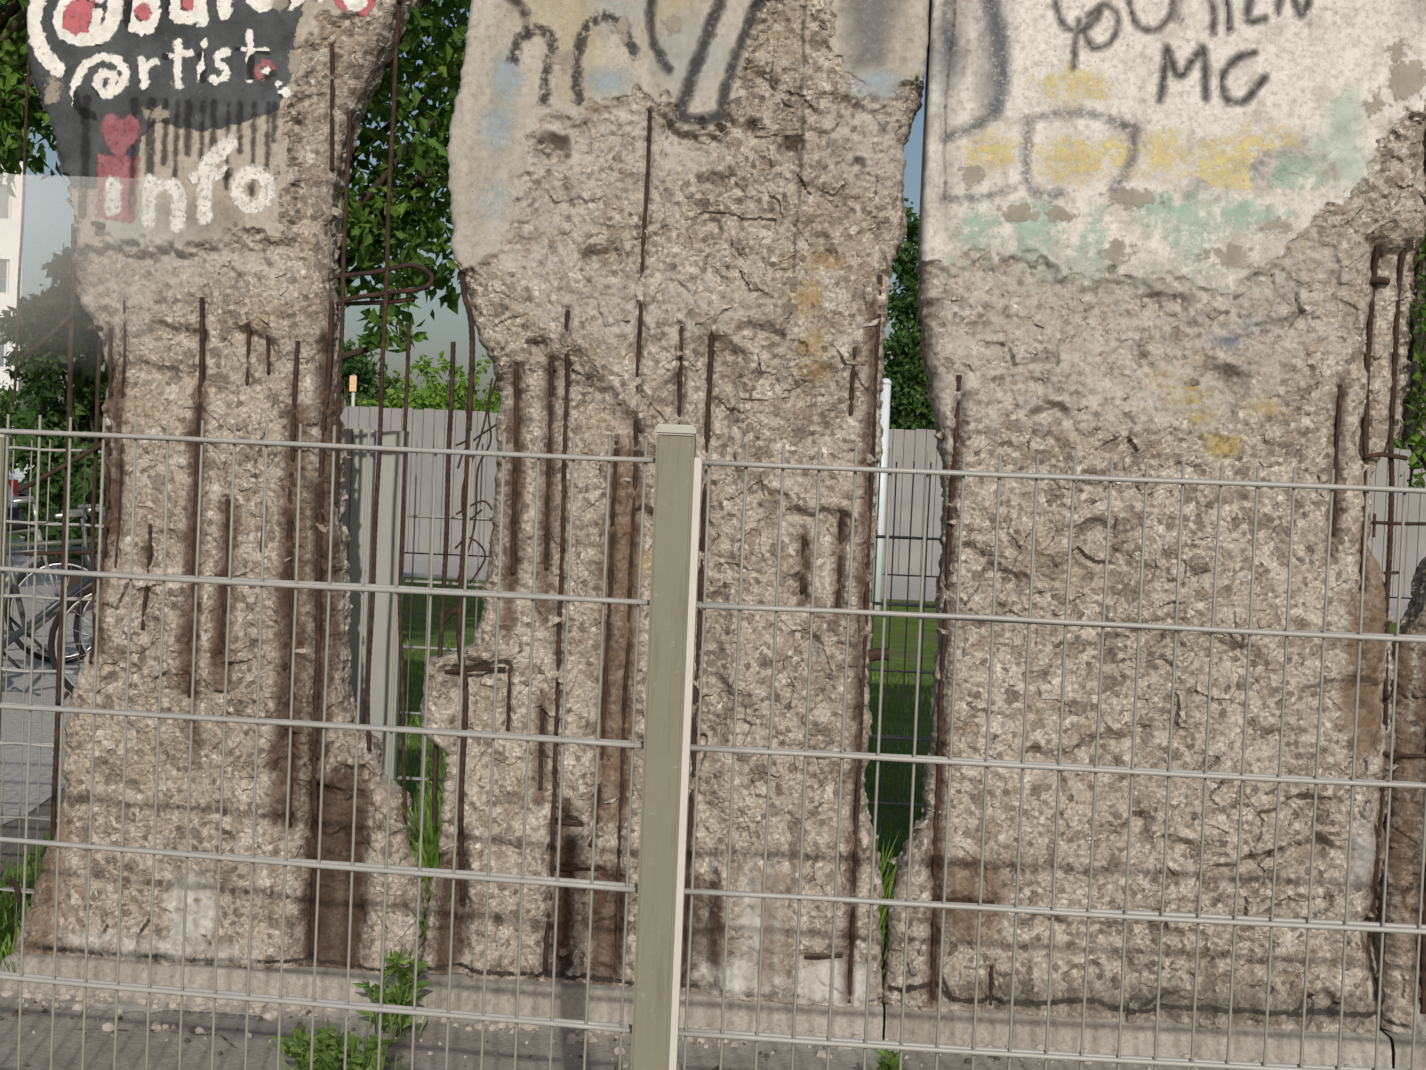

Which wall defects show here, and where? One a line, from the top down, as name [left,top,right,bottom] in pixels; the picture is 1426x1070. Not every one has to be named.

corrosion [98,362,121,649]
corrosion [180,515,201,691]
corrosion [191,392,205,473]
spalling [13,0,419,969]
corrosion [212,503,233,689]
corrosion [273,334,366,970]
corrosion [503,375,521,628]
corrosion [863,305,875,513]
spalling [355,0,1426,1037]
spalling [10,878,21,902]
corrosion [548,802,572,977]
corrosion [593,866,621,986]